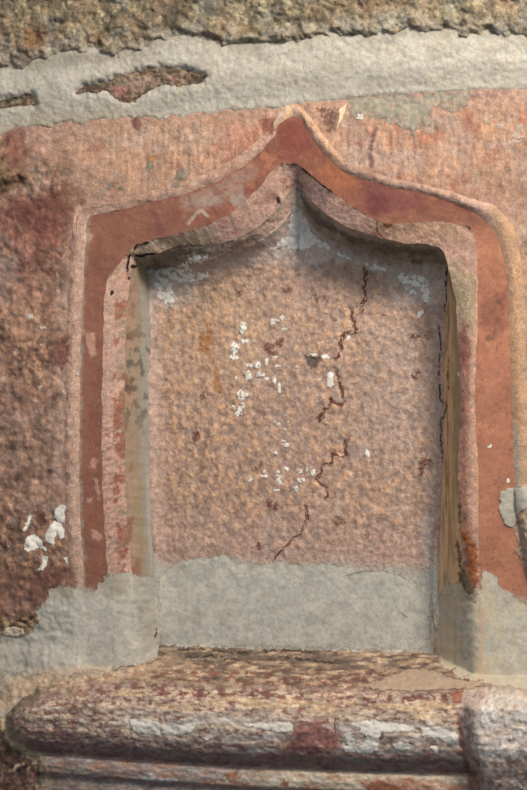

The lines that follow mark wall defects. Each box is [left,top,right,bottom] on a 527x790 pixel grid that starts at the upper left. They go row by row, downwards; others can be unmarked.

spalling [0,94,35,108]
spalling [75,67,208,101]
crack [315,265,368,500]
peeling [23,504,66,571]
crack [266,505,309,561]
corrosion [460,528,480,584]
spalling [0,613,39,634]
peeling [343,719,458,755]